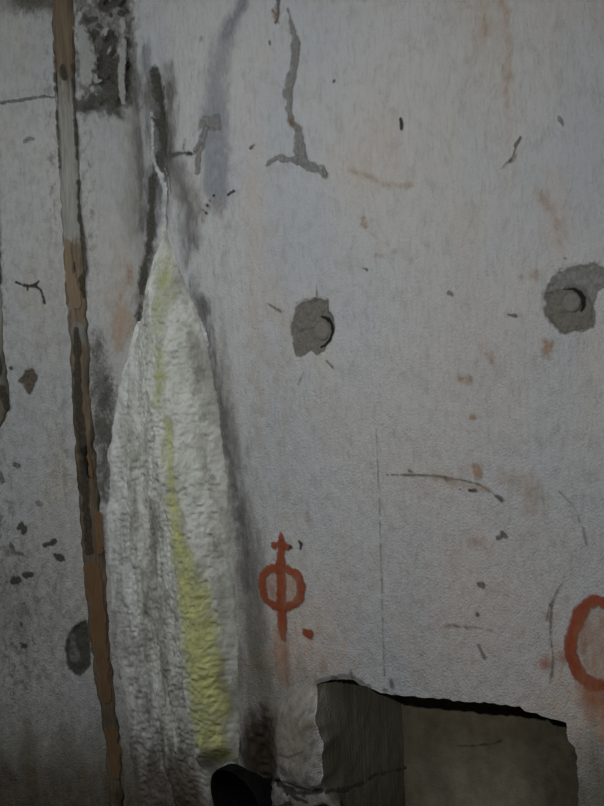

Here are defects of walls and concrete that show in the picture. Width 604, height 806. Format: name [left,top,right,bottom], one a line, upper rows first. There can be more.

crack [272,0,280,23]
water stain [166,73,227,245]
water stain [195,296,208,323]
spalling [291,291,335,368]
spalling [544,263,604,334]
water stain [90,333,113,502]
crack [269,766,407,806]